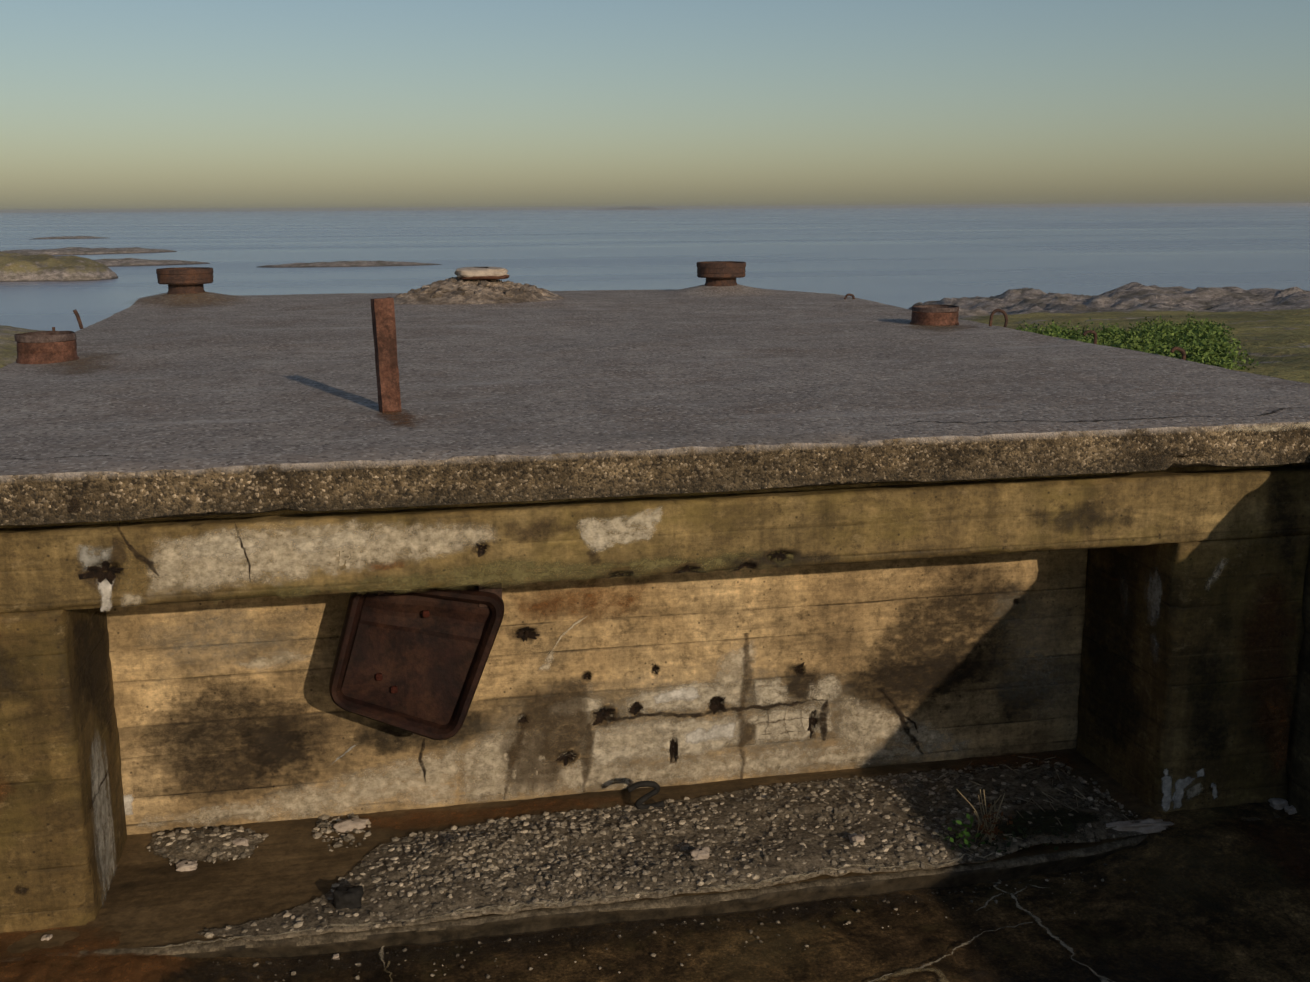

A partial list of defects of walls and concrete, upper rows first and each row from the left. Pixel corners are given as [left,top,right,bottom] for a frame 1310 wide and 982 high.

damp [80,547,109,566]
damp [124,522,492,605]
peeling [580,509,661,579]
damp [74,613,115,891]
damp [146,570,1021,822]
crack [881,688,923,754]
damp [1162,769,1217,811]
crack [868,879,1114,982]